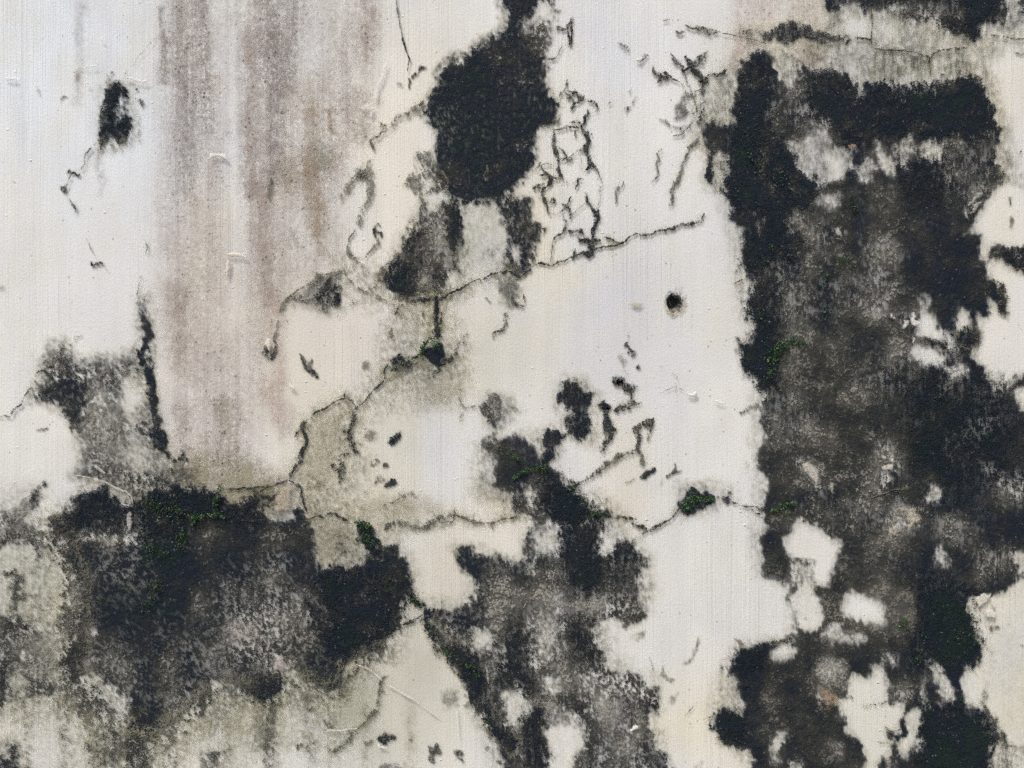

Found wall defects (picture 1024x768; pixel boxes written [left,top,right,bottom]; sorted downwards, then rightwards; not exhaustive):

damp [241,85,331,313]
damp [291,0,560,405]
crack [273,17,766,342]
crack [1,387,32,417]
crack [228,364,388,521]
damp [0,299,680,768]
crack [383,495,526,531]
crack [588,376,654,479]
crack [621,507,680,535]
damp [660,0,1024,768]